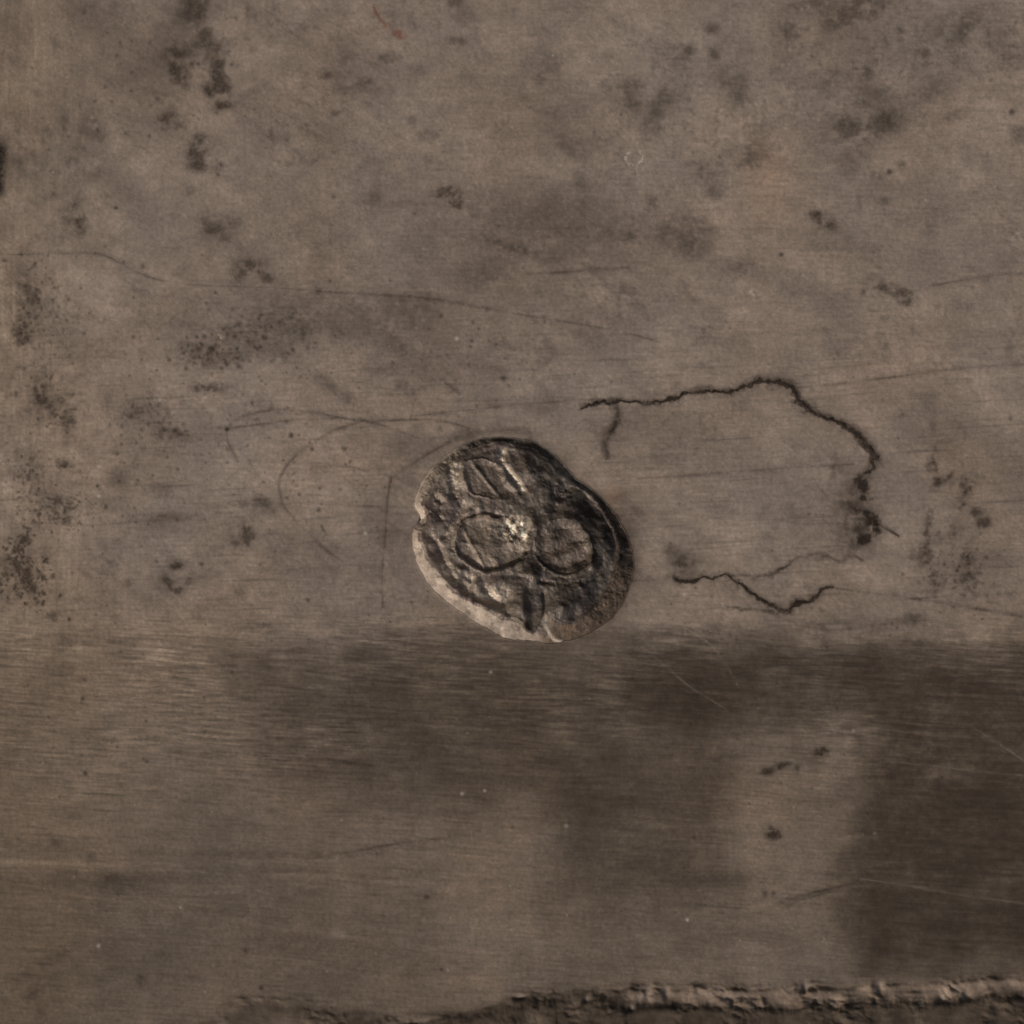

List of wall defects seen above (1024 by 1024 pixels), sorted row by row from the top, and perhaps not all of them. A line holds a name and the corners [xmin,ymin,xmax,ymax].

crack [581,377,899,545]
crack [674,573,833,614]
damp [858,665,1024,957]
spalling [193,976,1024,1024]